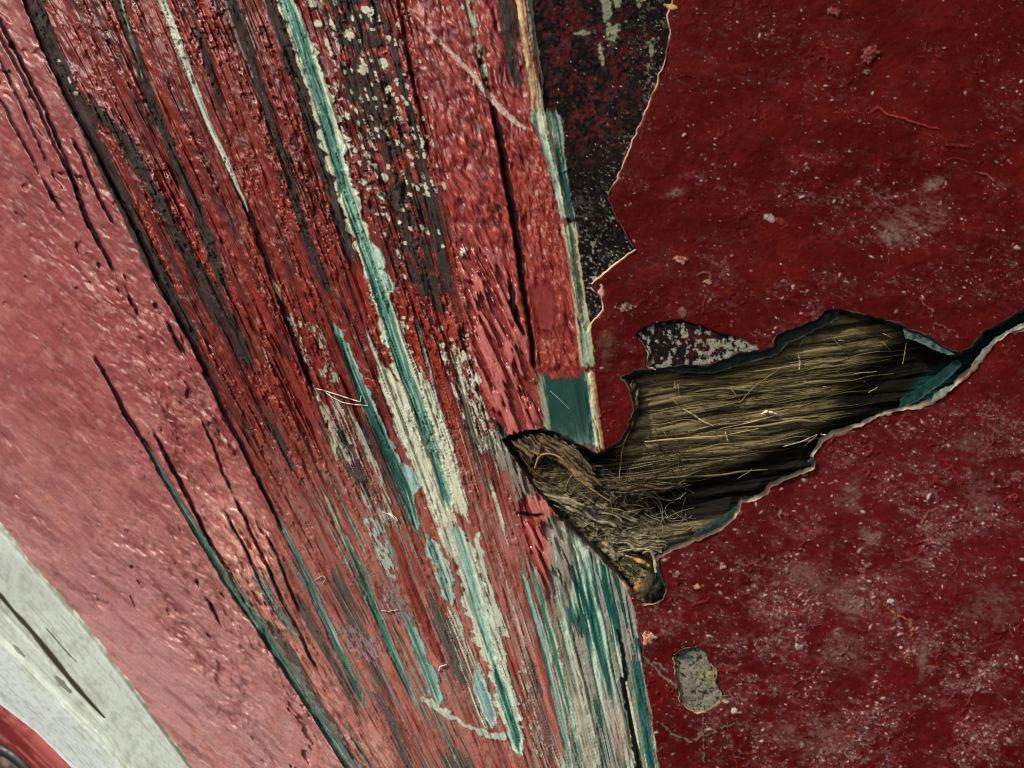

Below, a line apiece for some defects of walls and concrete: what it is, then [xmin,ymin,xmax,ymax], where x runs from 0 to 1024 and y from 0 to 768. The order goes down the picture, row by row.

crack [0,0,317,669]
peeling [288,313,417,630]
peeling [333,620,382,669]
peeling [379,351,545,757]
crack [479,58,535,369]
peeling [528,280,555,332]
peeling [531,0,673,327]
peeling [626,659,658,768]
peeling [672,645,737,714]
spalling [444,306,1024,606]